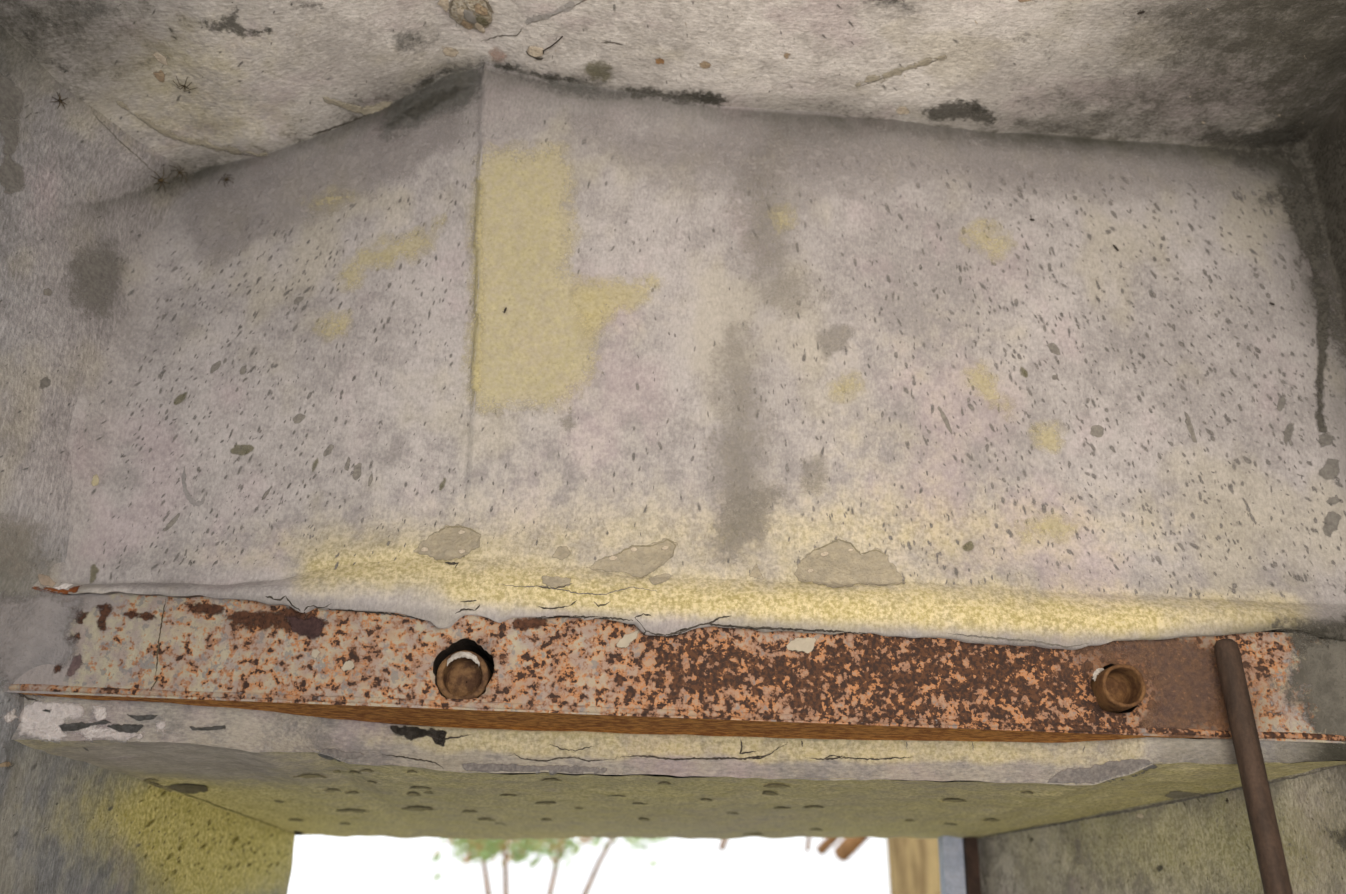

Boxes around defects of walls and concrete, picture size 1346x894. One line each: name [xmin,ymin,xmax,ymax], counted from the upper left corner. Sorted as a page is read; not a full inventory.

leakage [494,64,726,106]
leakage [1202,119,1346,479]
spalling [103,204,504,578]
spalling [786,154,1346,597]
leakage [1323,497,1341,537]
rust [32,565,156,676]
rust [184,602,328,639]
rust [513,618,547,631]
crack [456,583,866,637]
peeling [787,637,816,653]
rust [1078,639,1223,730]
spalling [59,714,157,751]